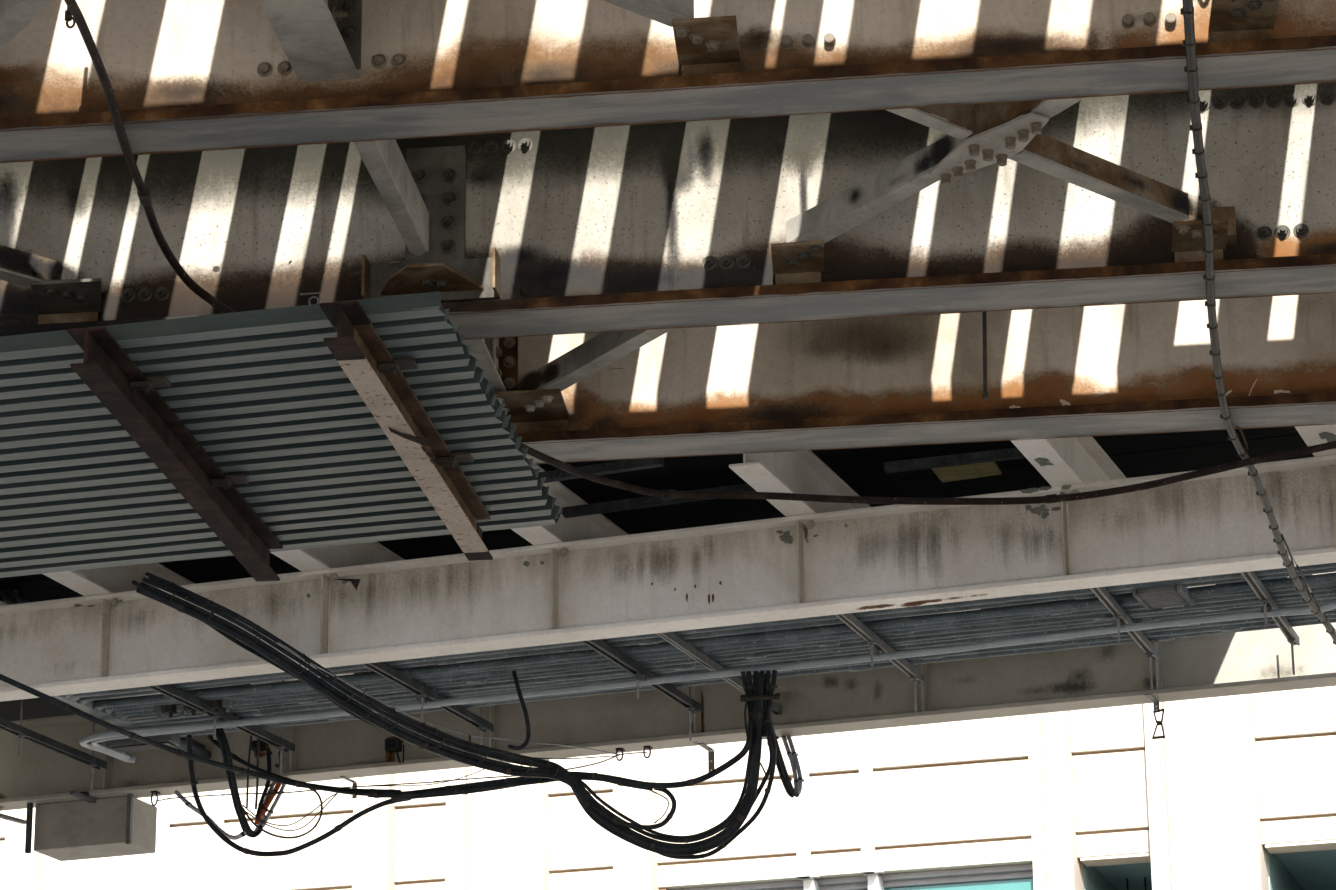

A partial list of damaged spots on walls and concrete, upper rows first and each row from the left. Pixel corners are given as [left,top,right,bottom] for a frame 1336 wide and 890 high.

corrosion [1271,1,1336,39]
corrosion [0,2,1212,118]
corrosion [98,254,405,321]
corrosion [441,202,1336,315]
corrosion [463,292,1336,340]
corrosion [516,363,1336,444]
corrosion [565,424,1333,463]